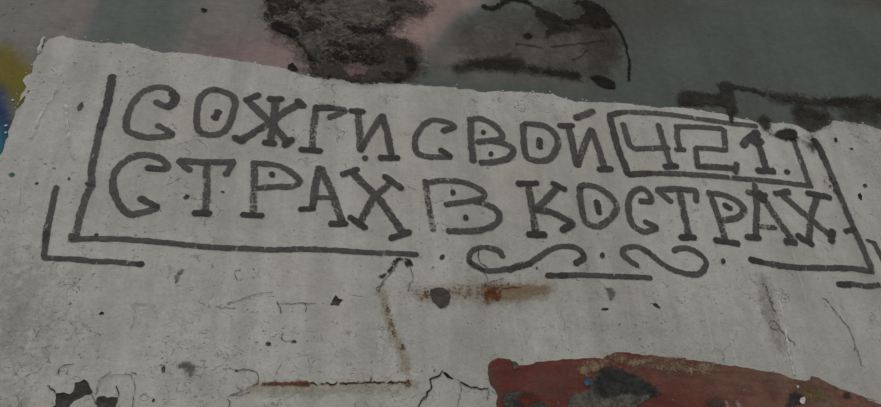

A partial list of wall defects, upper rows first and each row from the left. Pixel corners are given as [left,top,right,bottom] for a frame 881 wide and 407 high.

corrosion [447,280,548,306]
corrosion [378,283,407,366]
crack [823,298,862,366]
peeling [47,372,137,407]
corrosion [262,377,412,393]
crack [418,371,496,407]
peeling [502,391,549,407]
peeling [568,352,719,407]